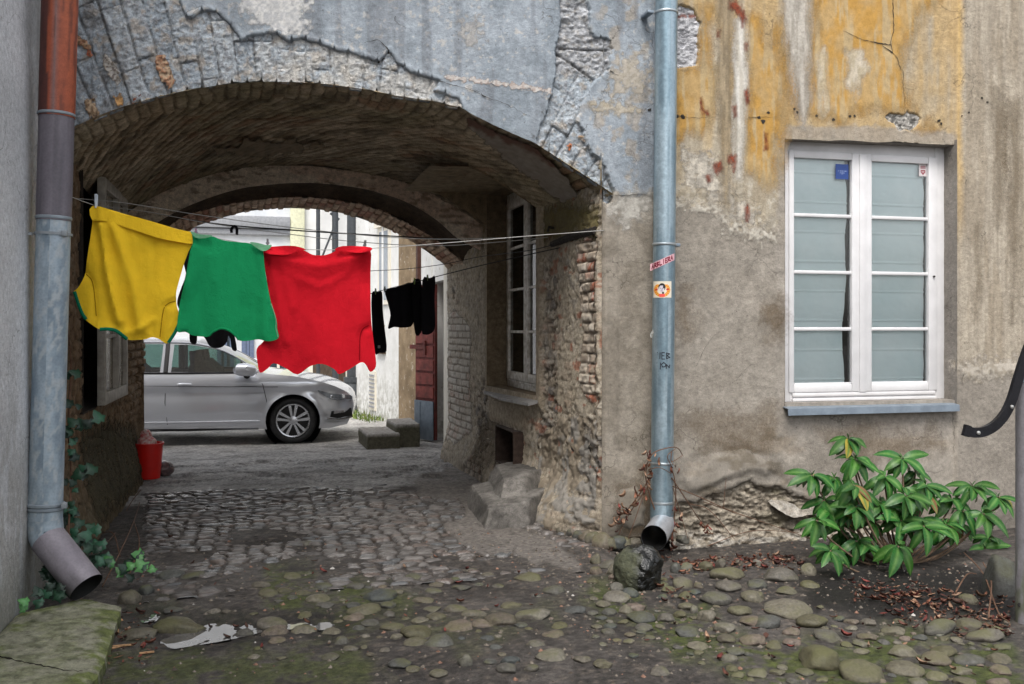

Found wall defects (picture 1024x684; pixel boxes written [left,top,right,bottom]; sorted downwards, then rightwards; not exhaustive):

flaking render [74,0,653,230]
peeling [676,5,779,249]
peeling [741,0,942,188]
crack [845,5,905,112]
flaking render [575,236,599,403]
flaking render [669,480,896,550]